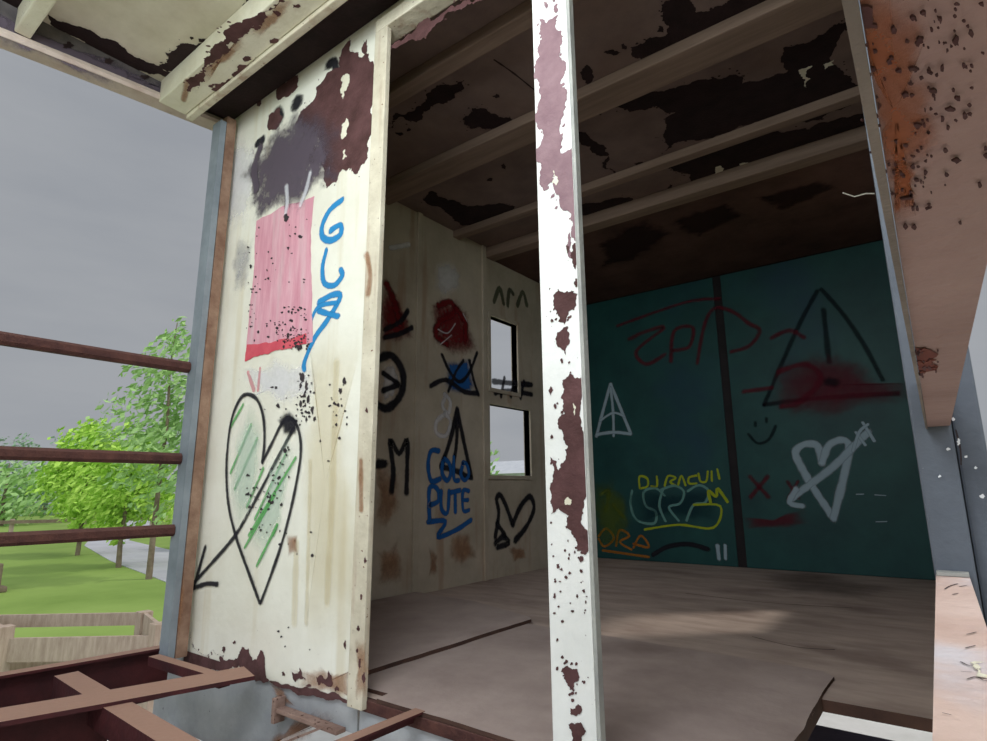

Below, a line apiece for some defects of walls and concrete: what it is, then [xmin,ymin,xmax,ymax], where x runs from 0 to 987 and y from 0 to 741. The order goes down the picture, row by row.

peeling [48,0,300,92]
peeling [267,75,298,130]
peeling [297,39,374,188]
peeling [604,0,766,59]
peeling [616,18,858,151]
peeling [668,105,865,189]
rust [865,14,925,207]
peeling [493,0,633,623]
peeling [276,373,316,426]
peeling [328,377,348,440]
peeling [183,632,347,703]
peeling [556,655,589,741]